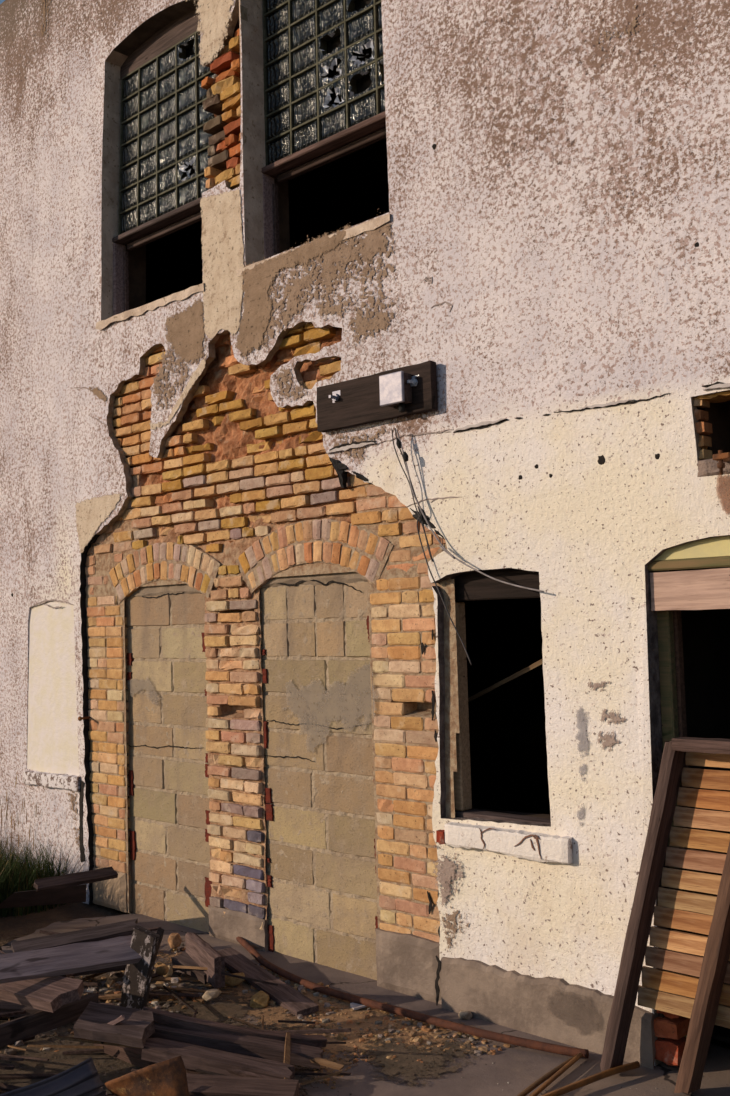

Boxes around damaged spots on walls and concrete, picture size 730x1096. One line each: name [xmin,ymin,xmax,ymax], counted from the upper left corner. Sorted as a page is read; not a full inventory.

spalling [201,19,241,189]
crack [702,382,730,391]
crack [326,393,670,453]
spalling [85,212,470,952]
peeling [68,791,80,857]
spalling [149,941,204,1013]
spalling [258,963,522,1089]